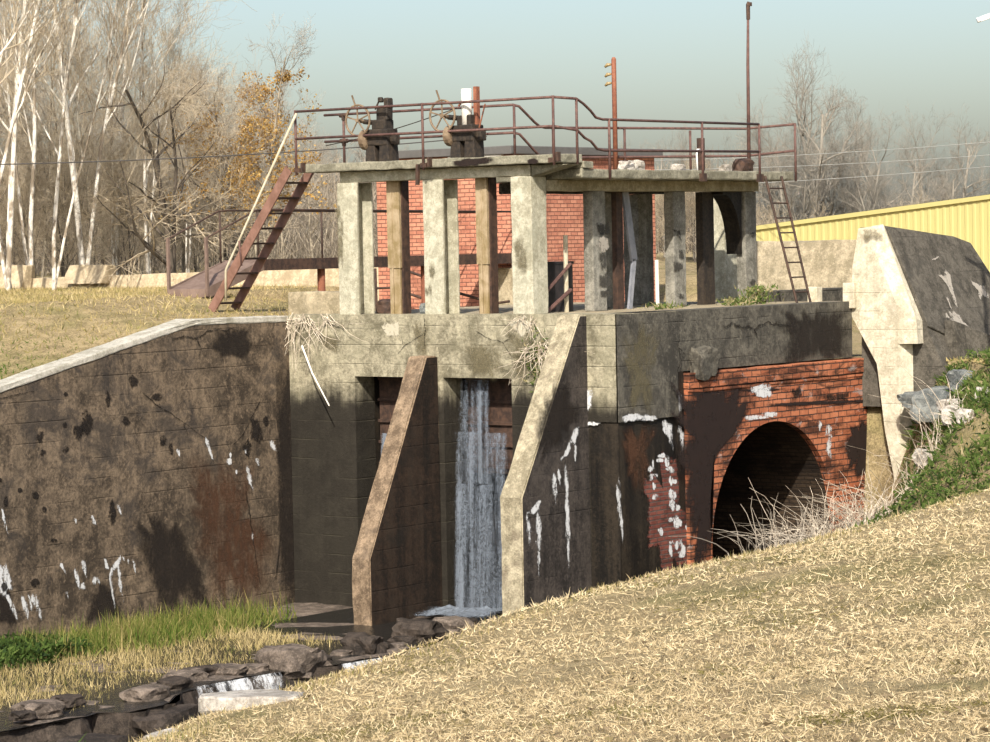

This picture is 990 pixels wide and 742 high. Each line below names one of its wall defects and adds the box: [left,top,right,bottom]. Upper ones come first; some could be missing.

water stain [0,565,41,624]
water stain [60,556,136,621]
water stain [140,516,210,610]
efflorescence [526,501,541,570]
water stain [537,383,599,562]
peeling [642,451,687,571]